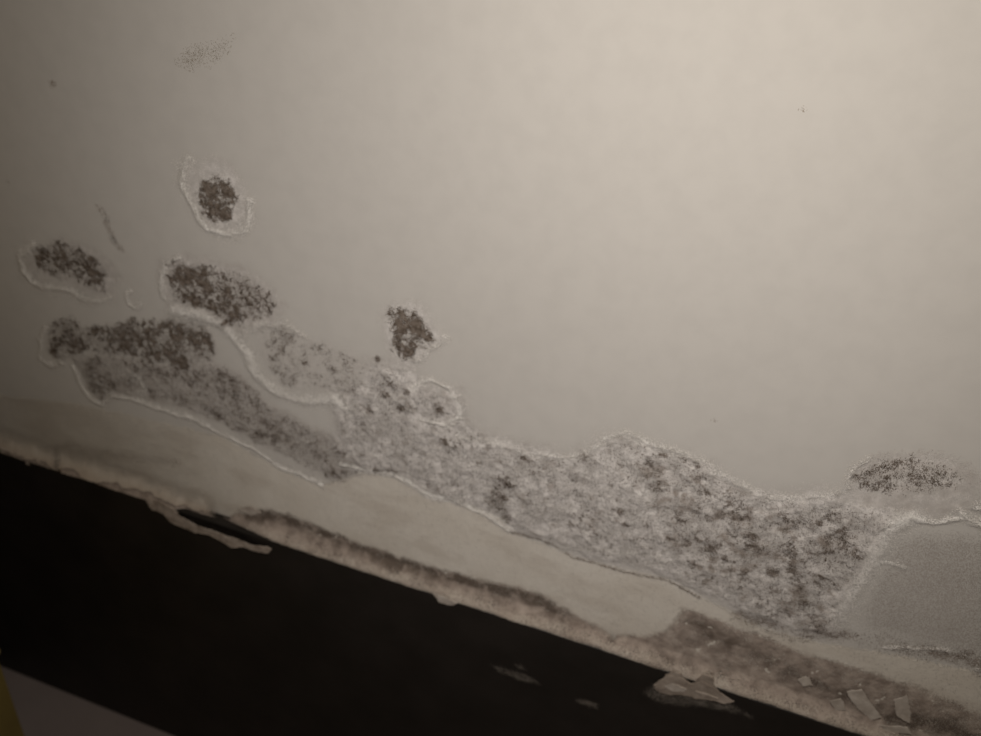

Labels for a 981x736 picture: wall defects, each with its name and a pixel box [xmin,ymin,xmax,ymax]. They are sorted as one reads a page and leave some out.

leakage [171,153,258,245]
peeling [0,428,981,736]
leakage [12,234,981,659]